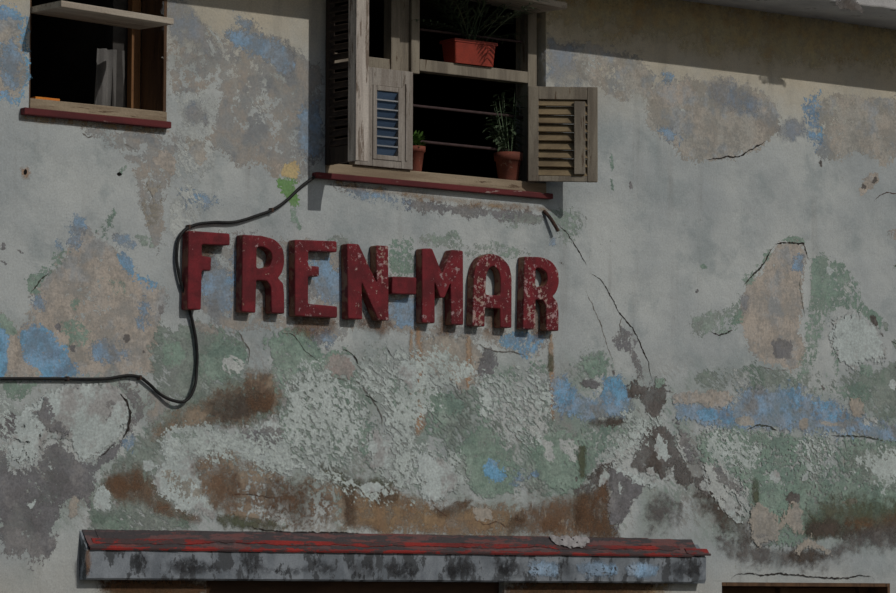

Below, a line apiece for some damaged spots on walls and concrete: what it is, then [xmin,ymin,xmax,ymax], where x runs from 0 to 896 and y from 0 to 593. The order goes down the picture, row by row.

peeling [0,2,31,109]
peeling [546,39,896,196]
peeling [0,125,896,578]
crack [558,224,653,382]
crack [733,571,874,579]